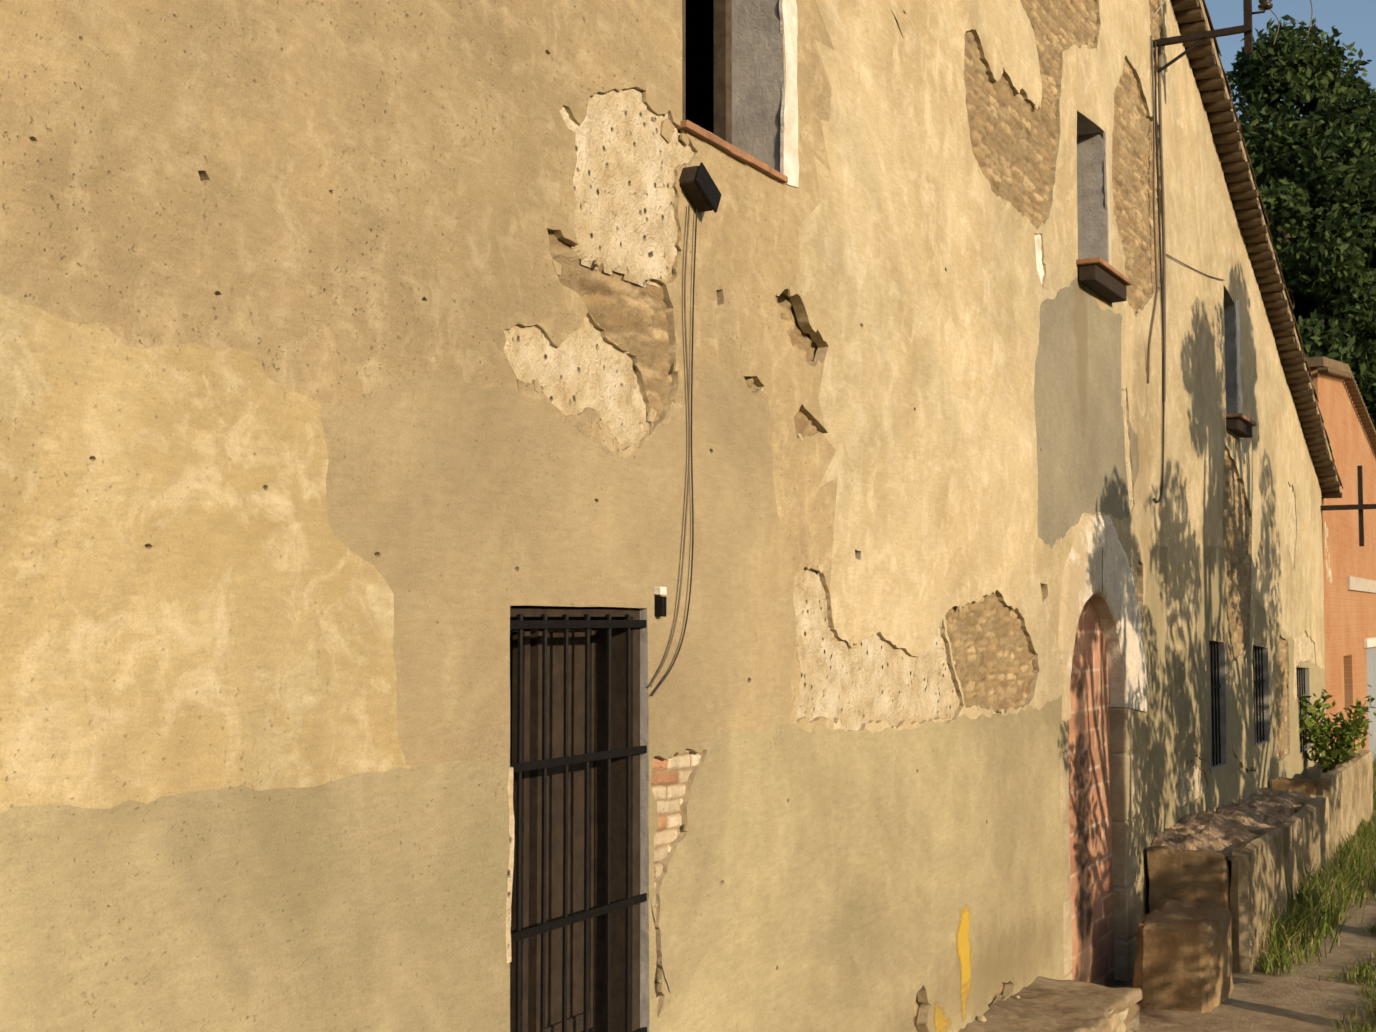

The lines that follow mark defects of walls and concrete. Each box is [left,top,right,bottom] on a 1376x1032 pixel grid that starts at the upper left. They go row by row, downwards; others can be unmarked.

spalling [1149,0,1165,83]
flaking render [503,88,694,449]
spalling [775,286,818,361]
spalling [964,0,1099,284]
spalling [1112,59,1158,316]
spalling [794,408,822,442]
spalling [1223,448,1252,661]
flaking render [793,564,1035,731]
flaking render [651,749,701,908]
flaking render [1172,762,1208,808]